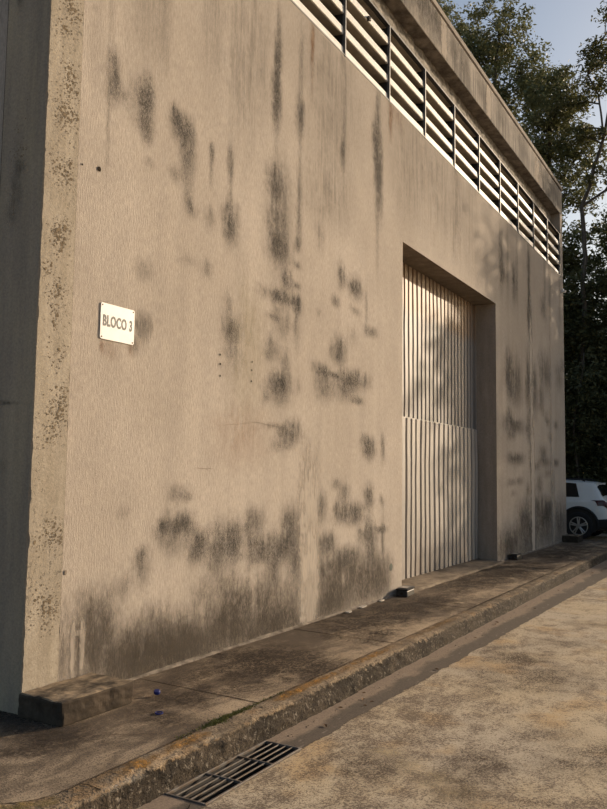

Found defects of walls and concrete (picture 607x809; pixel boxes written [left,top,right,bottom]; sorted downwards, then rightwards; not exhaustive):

leakage [172,104,193,165]
leakage [373,107,381,205]
leakage [225,203,237,240]
leakage [269,165,286,256]
leakage [273,273,300,310]
leakage [500,252,564,553]
leakage [70,450,385,678]